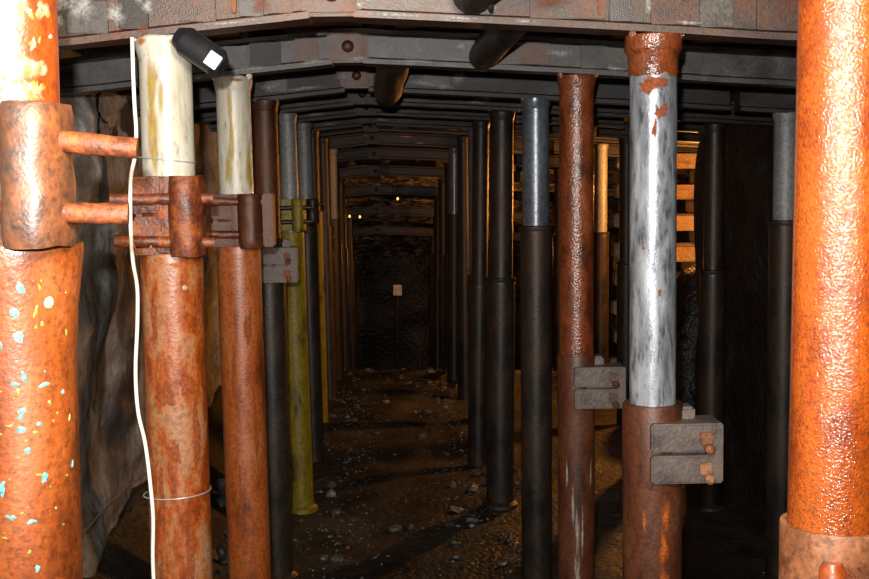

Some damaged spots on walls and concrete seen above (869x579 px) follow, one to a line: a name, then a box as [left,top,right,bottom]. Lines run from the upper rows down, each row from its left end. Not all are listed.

peeling [0,0,53,101]
corrosion [158,376,201,466]
corrosion [660,504,669,579]